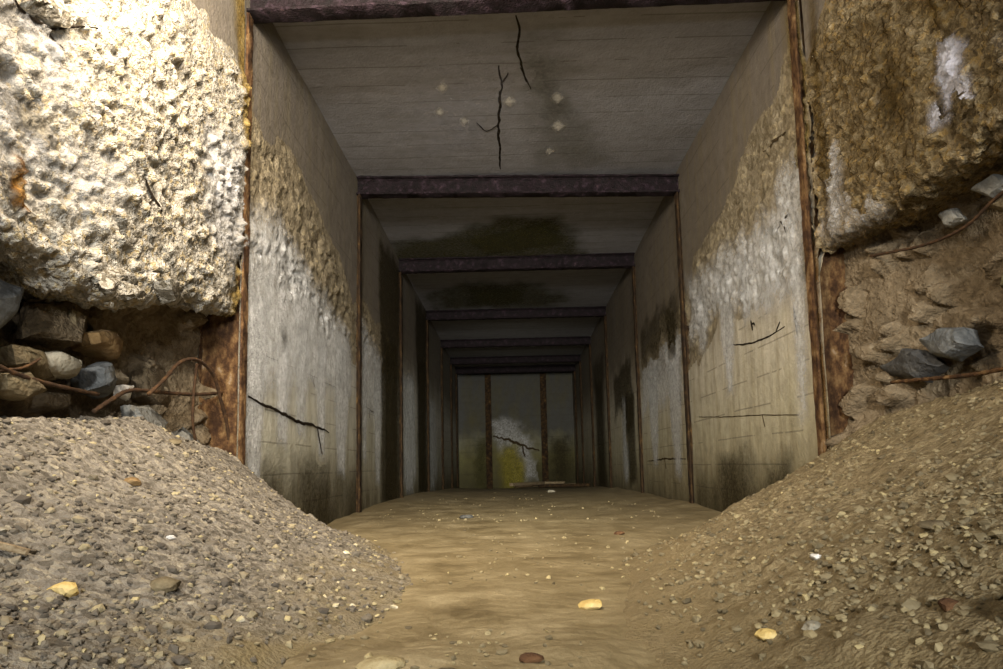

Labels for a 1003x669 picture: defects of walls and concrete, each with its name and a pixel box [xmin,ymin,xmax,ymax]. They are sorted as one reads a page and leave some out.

crack [13,0,98,49]
spalling [0,0,250,317]
crack [477,15,531,169]
spalling [804,0,1003,255]
crack [248,395,329,453]
damp [204,129,586,501]
crack [493,435,539,457]
damp [594,169,805,483]
rust [813,253,828,449]